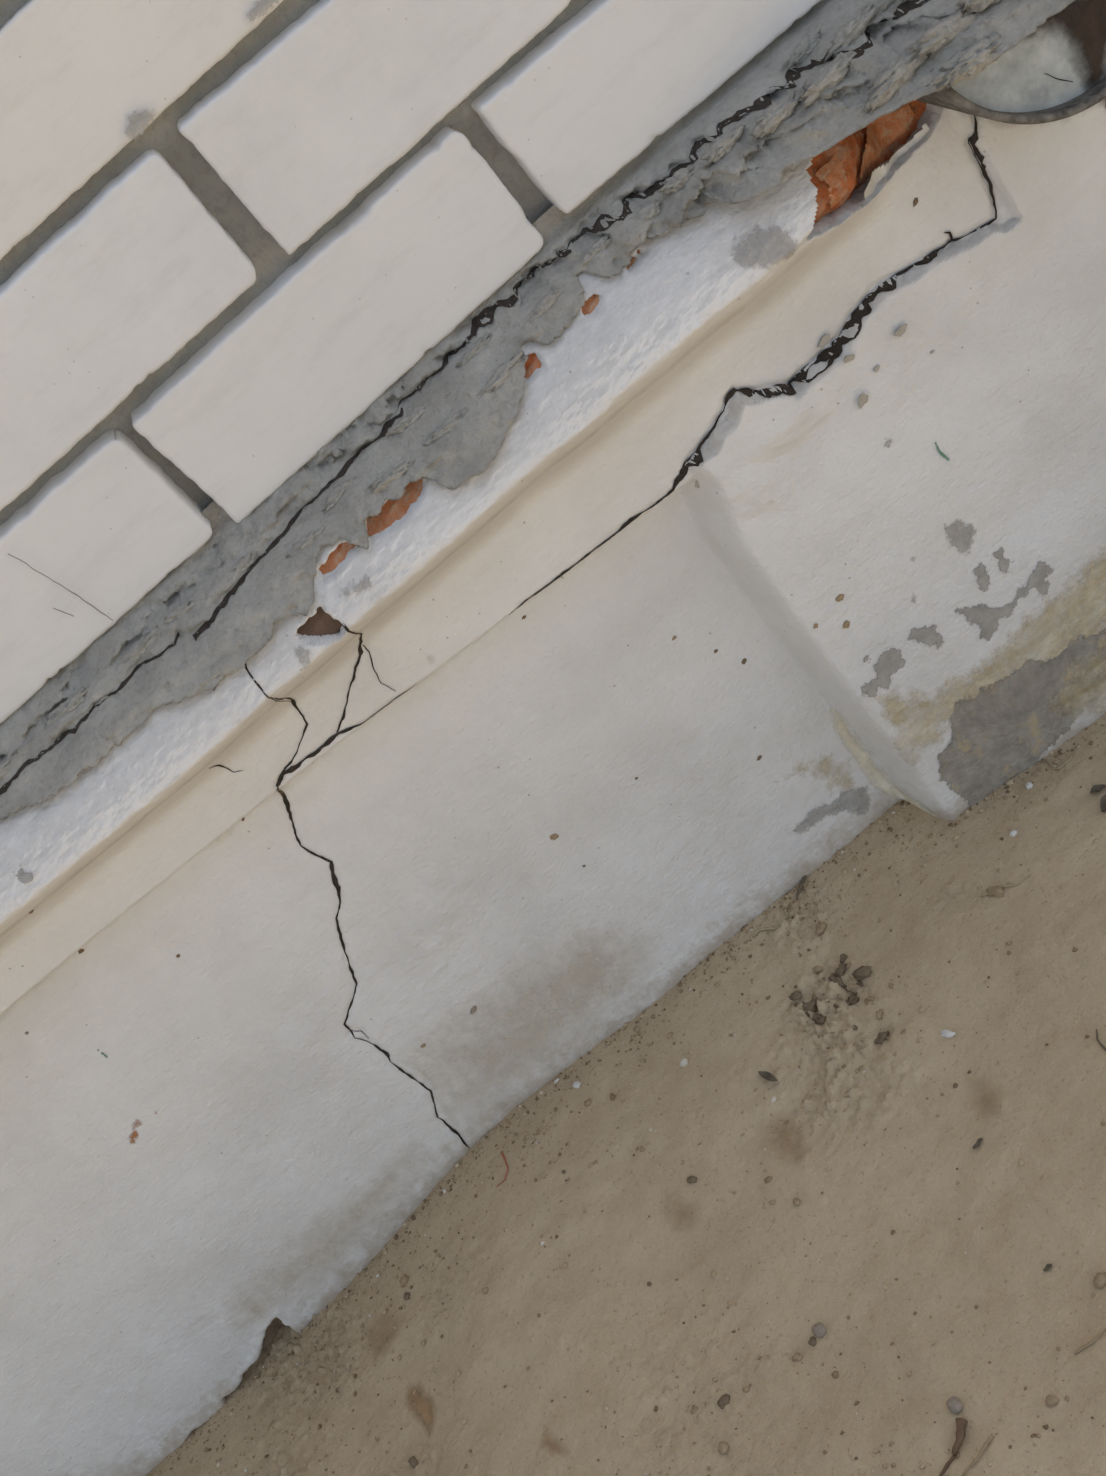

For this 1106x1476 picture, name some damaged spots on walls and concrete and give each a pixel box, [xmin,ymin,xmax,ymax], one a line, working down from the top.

flaking render [806,100,929,224]
flaking render [581,294,599,316]
crack [0,0,997,795]
flaking render [524,353,541,378]
flaking render [297,607,342,637]
flaking render [319,479,423,574]
peeling [861,625,944,697]
water stain [887,560,1106,744]
peeling [945,522,1054,641]
peeling [938,628,1106,807]
peeling [794,788,869,832]
crack [245,624,470,1149]